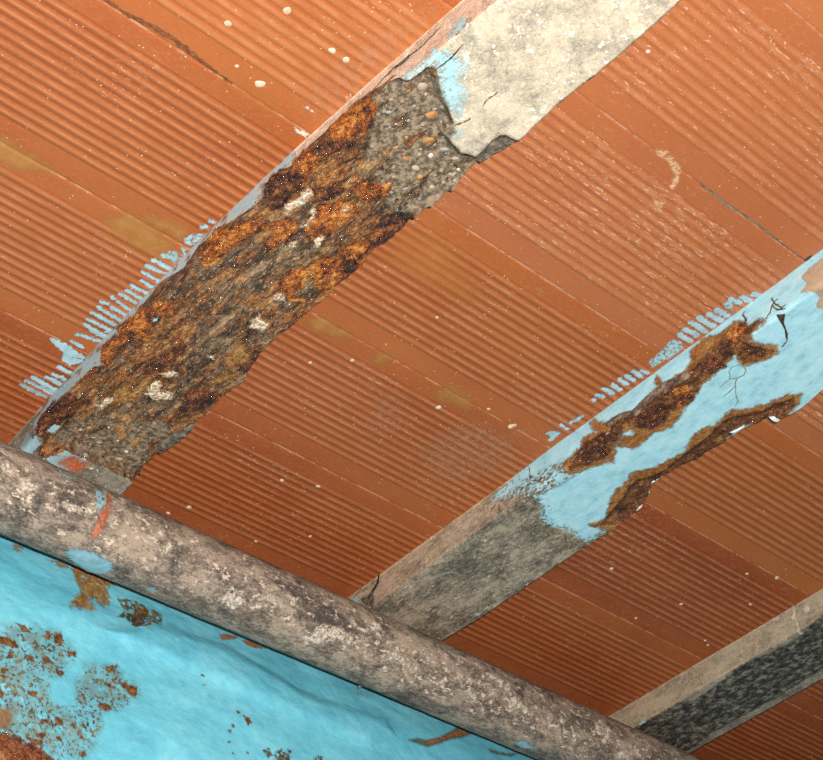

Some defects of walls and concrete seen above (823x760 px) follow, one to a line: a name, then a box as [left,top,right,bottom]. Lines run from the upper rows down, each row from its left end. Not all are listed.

spalling [20,48,518,484]
peeling [490,249,823,555]
corrosion [0,624,139,759]
corrosion [52,560,162,627]